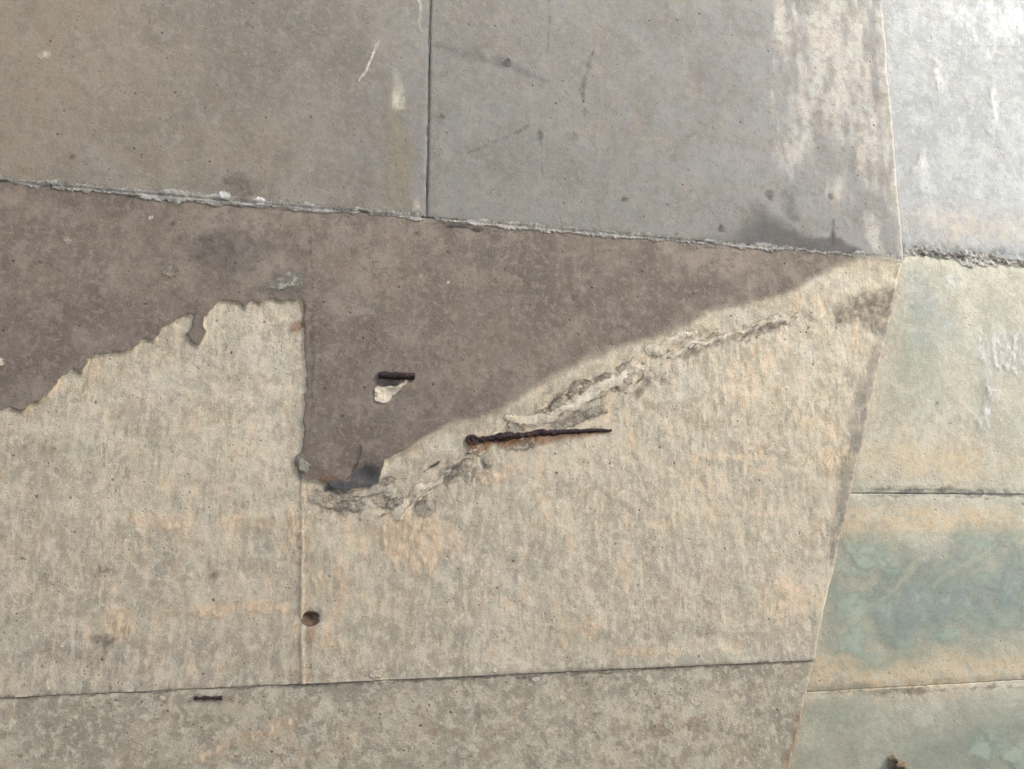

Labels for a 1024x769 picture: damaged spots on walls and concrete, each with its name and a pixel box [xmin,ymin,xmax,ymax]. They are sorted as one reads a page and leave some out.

water stain [751,219,856,254]
spalling [0,258,902,701]